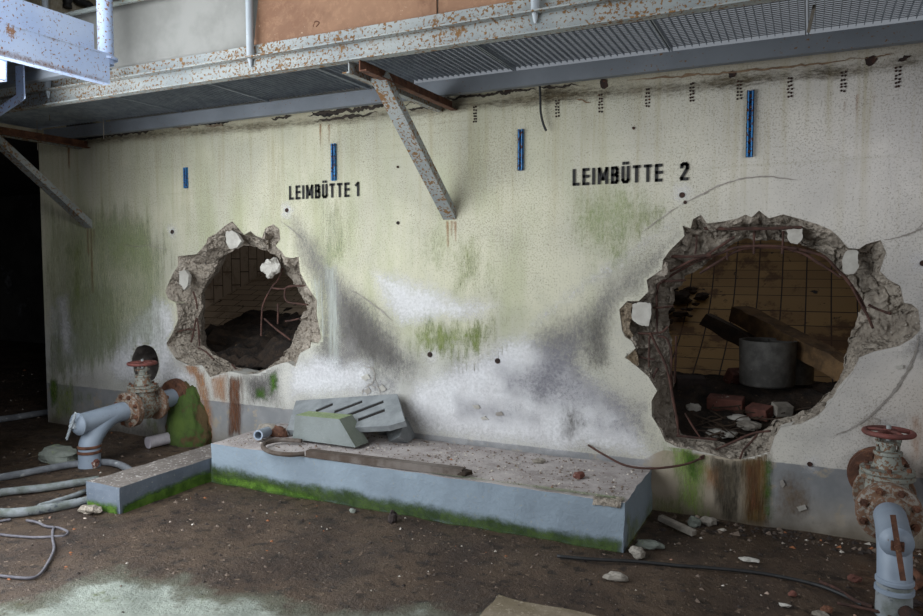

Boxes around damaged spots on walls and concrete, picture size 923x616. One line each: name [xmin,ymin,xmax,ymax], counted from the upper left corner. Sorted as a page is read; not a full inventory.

crack [641,176,795,233]
spalling [132,345,159,381]
damp [111,301,191,380]
rust [189,366,274,435]
spalling [165,222,321,377]
damp [292,239,408,393]
damp [379,278,482,321]
damp [412,296,643,454]
spalling [619,211,920,460]
crack [834,330,920,436]
rust [707,455,770,523]